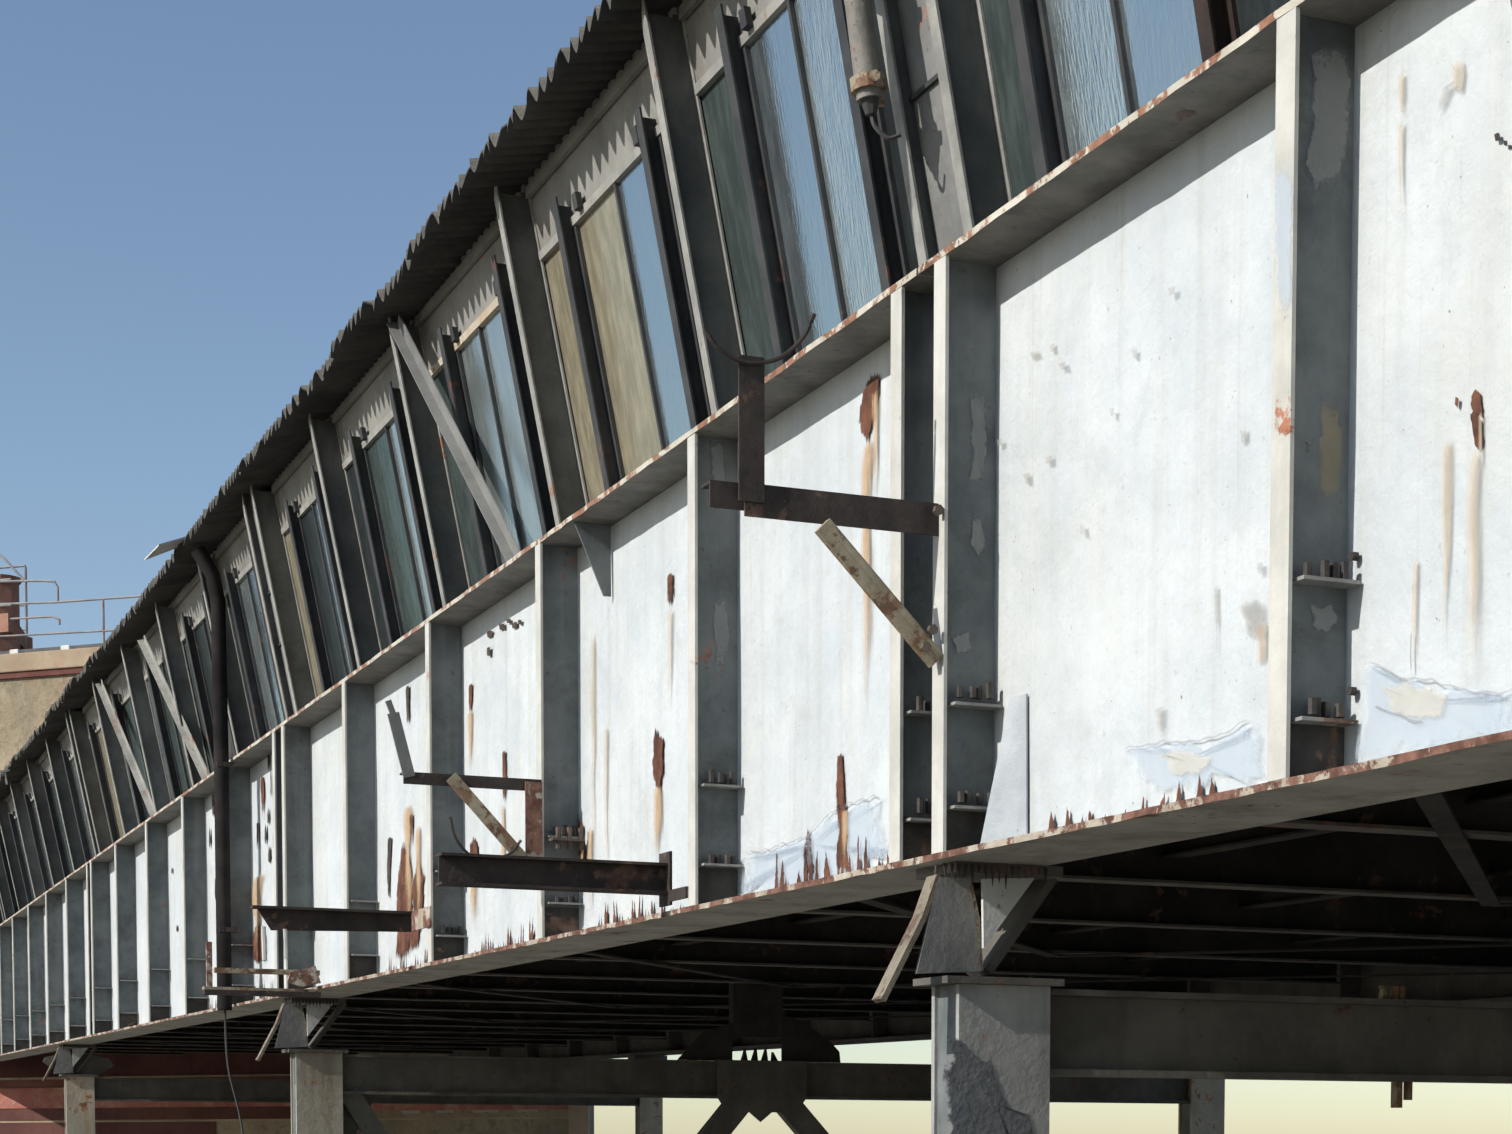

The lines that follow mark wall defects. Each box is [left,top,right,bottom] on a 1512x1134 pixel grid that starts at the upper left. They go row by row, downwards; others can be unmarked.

corrosion [859,374,879,496]
corrosion [1455,390,1482,603]
corrosion [861,529,869,564]
peeling [1372,634,1507,723]
corrosion [652,728,663,846]
corrosion [775,754,889,888]
corrosion [1048,809,1106,829]
corrosion [1125,777,1216,813]
peeling [1126,720,1245,776]
peeling [943,1036,1032,1134]